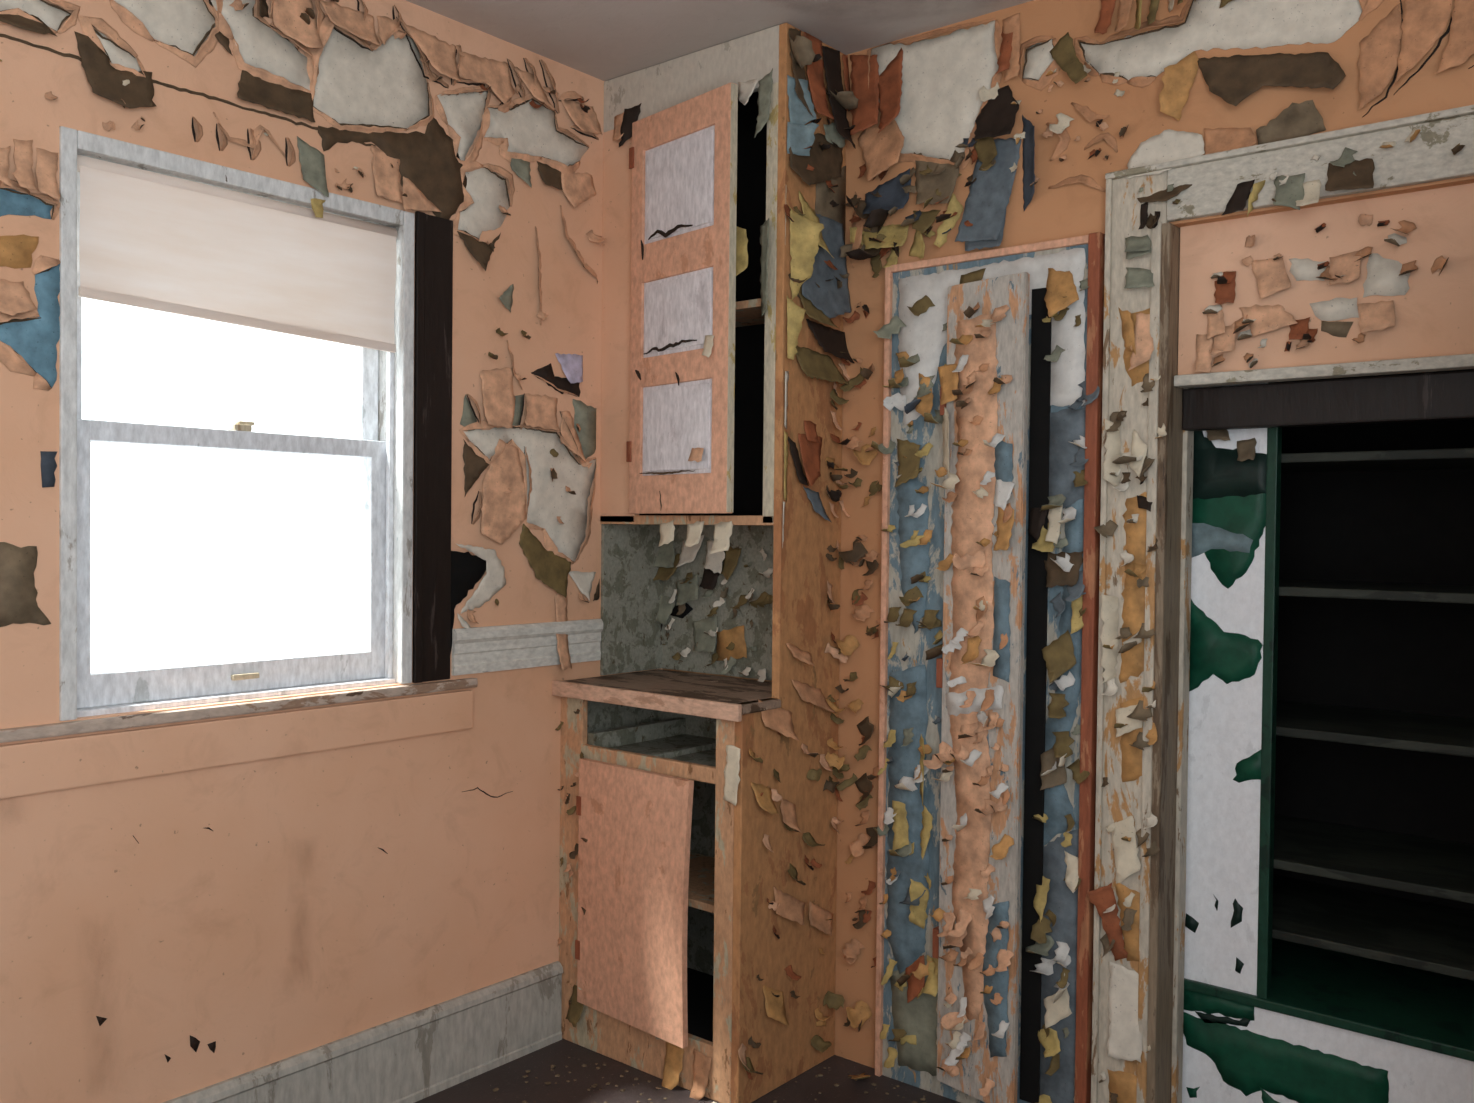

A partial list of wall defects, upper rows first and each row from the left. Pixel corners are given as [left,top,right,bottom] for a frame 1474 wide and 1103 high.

peeling [0,0,606,284]
peeling [1221,128,1420,216]
peeling [0,235,61,391]
peeling [782,0,1384,548]
peeling [1195,214,1449,373]
peeling [0,542,51,627]
peeling [457,227,600,670]
peeling [1189,599,1263,691]
peeling [1192,430,1267,588]
peeling [1233,750,1261,783]
peeling [1088,812,1160,1103]
peeling [1183,989,1389,1103]